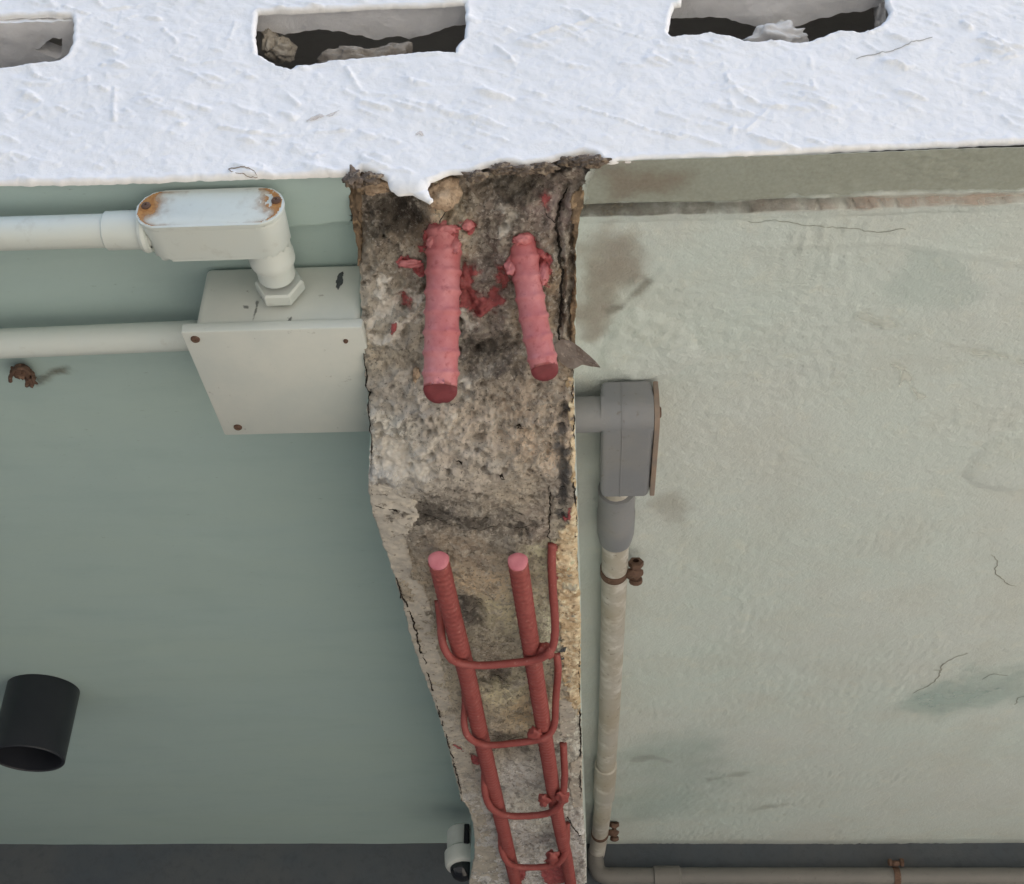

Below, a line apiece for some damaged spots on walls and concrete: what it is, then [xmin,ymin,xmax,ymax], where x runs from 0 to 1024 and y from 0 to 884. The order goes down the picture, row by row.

crack [856,37,932,59]
rust [137,192,163,226]
rust [258,188,282,222]
crack [748,220,906,233]
crack [544,184,568,340]
spalling [359,160,600,884]
crack [914,653,968,693]